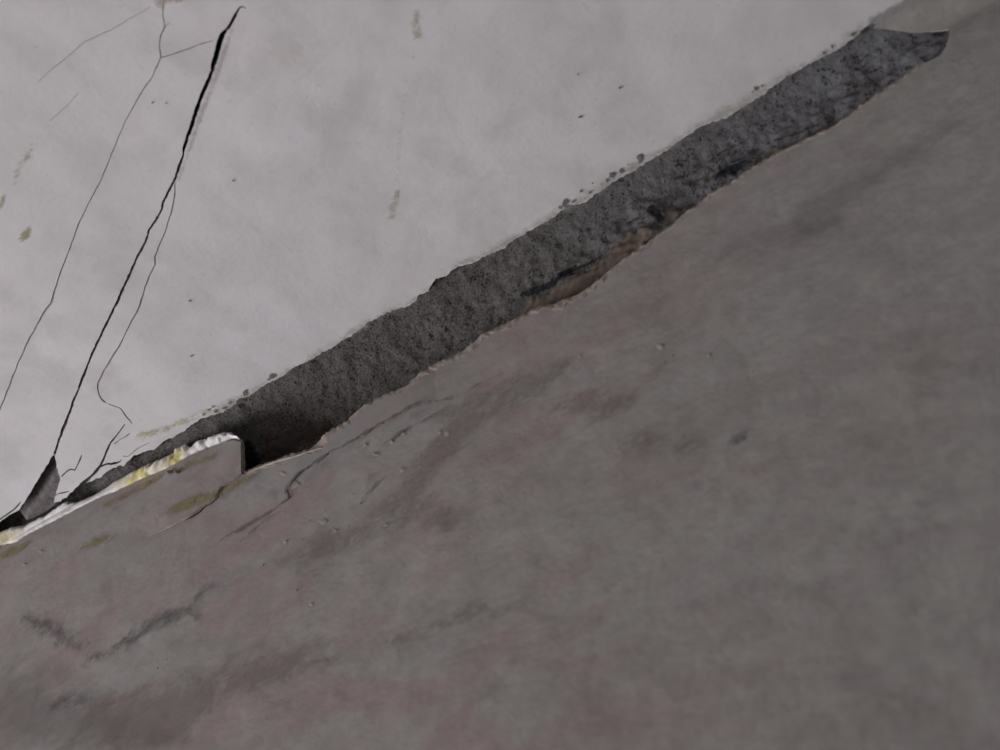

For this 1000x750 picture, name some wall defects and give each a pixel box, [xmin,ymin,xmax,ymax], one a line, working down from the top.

crack [0,1,245,496]
crack [186,491,221,520]
spalling [0,24,950,547]